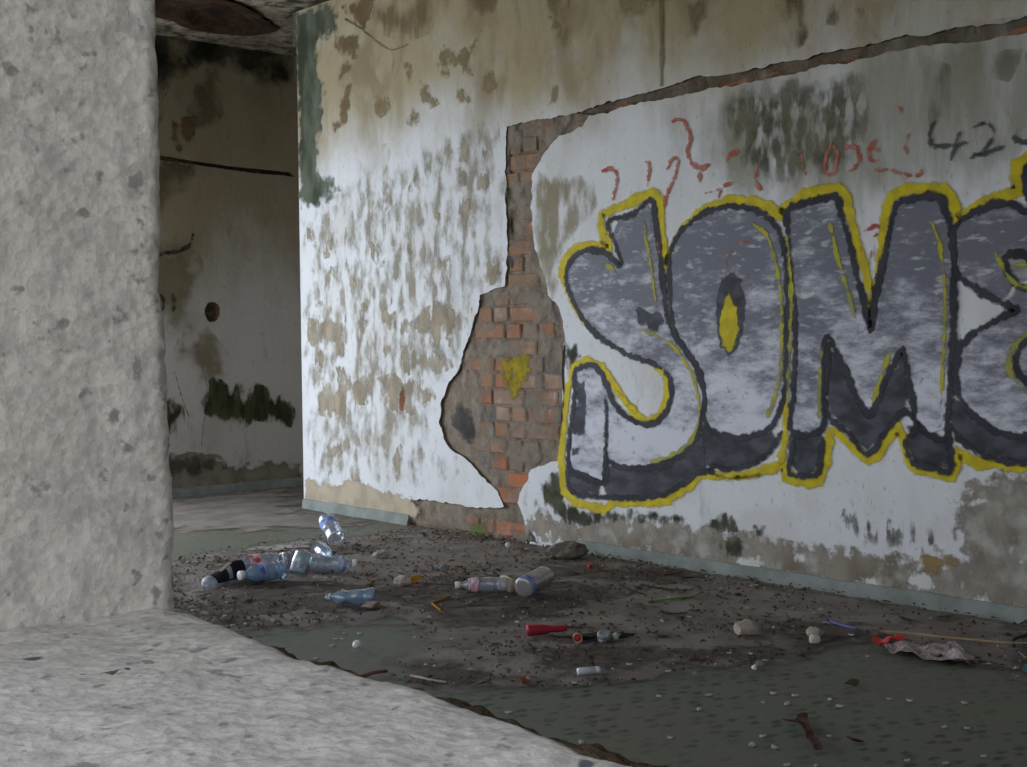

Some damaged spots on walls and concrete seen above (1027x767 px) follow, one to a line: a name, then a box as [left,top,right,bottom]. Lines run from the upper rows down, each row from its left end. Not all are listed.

spalling [155,0,278,36]
damp [155,0,425,207]
damp [410,87,437,122]
damp [439,44,497,92]
damp [620,0,664,86]
damp [158,248,187,320]
flaking render [306,114,588,543]
damp [525,469,1027,608]